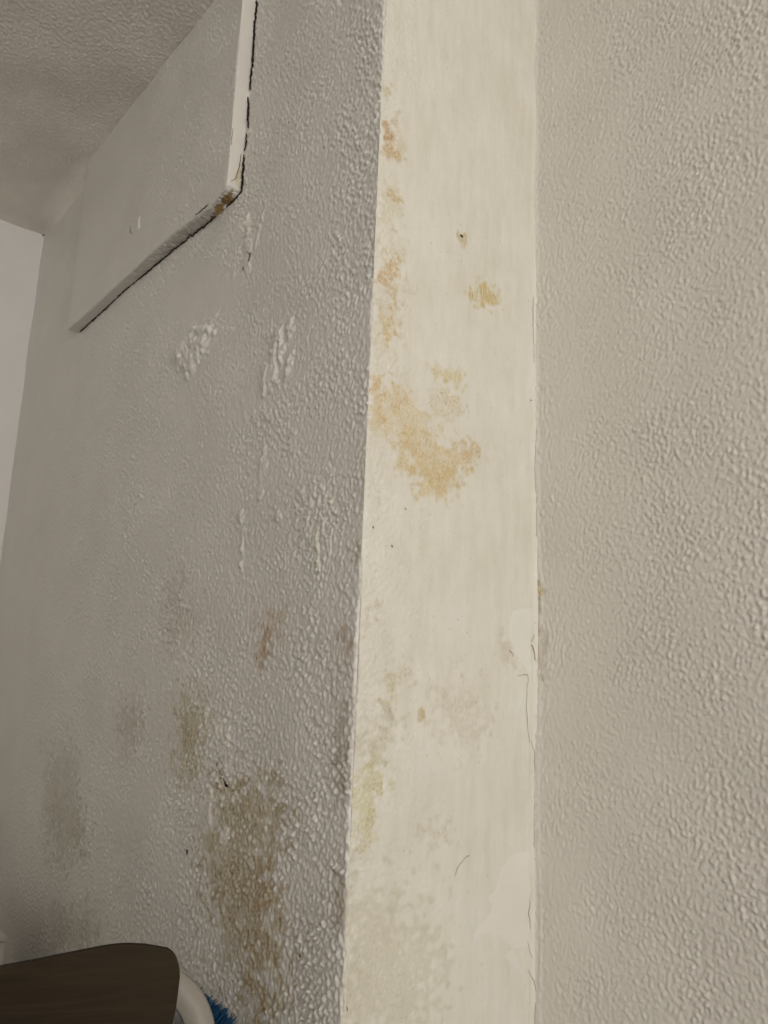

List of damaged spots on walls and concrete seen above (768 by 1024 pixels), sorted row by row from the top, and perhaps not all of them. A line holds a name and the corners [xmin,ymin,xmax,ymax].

crack [80,0,258,332]